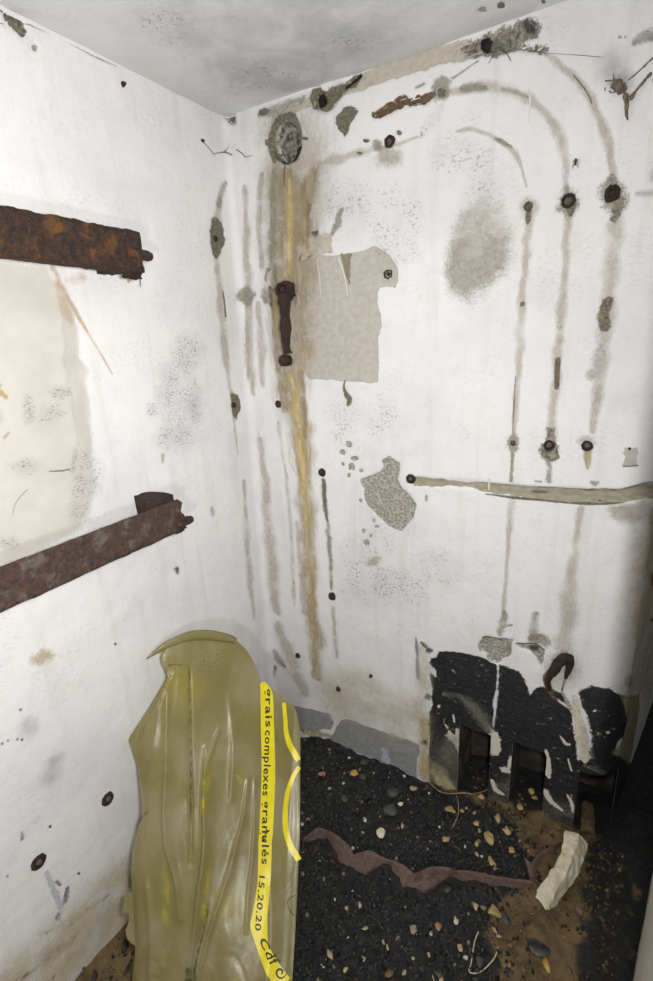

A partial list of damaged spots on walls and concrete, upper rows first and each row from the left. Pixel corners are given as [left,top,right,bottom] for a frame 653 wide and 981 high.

peeling [258,18,549,164]
peeling [297,233,398,406]
spalling [339,441,428,545]
spalling [478,634,550,666]
peeling [571,695,591,764]